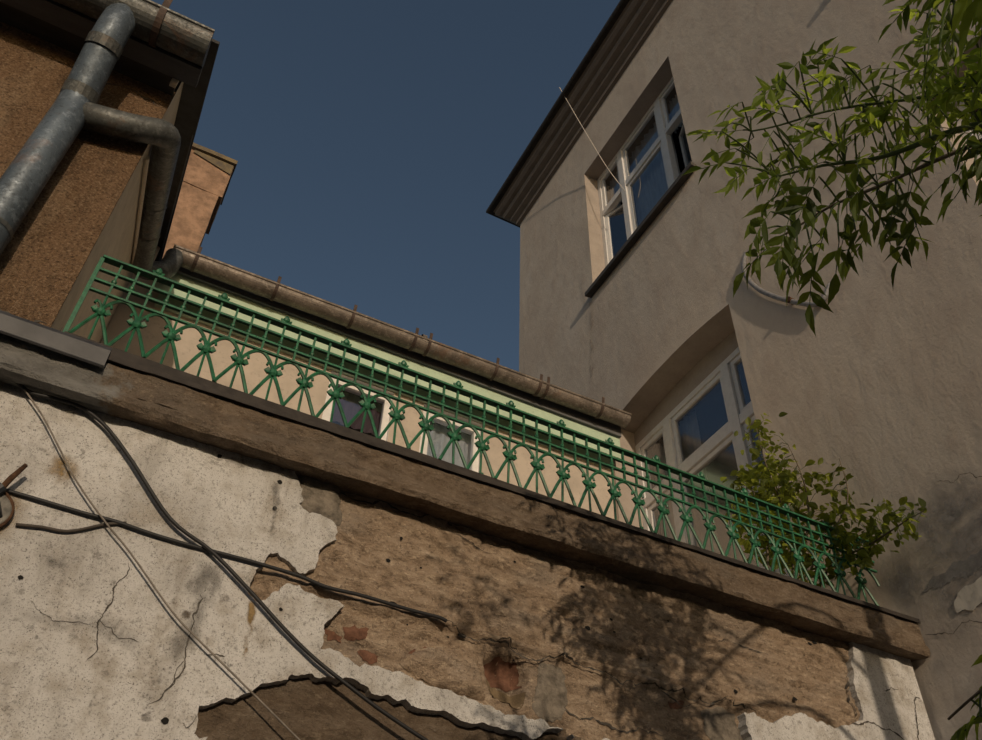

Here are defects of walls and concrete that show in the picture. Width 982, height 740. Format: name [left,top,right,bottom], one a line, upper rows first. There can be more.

rust [0,492,15,529]
crack [30,563,138,660]
crack [149,595,225,704]
flaking render [248,491,860,740]
peeling [954,576,982,613]
flaking render [183,677,522,740]